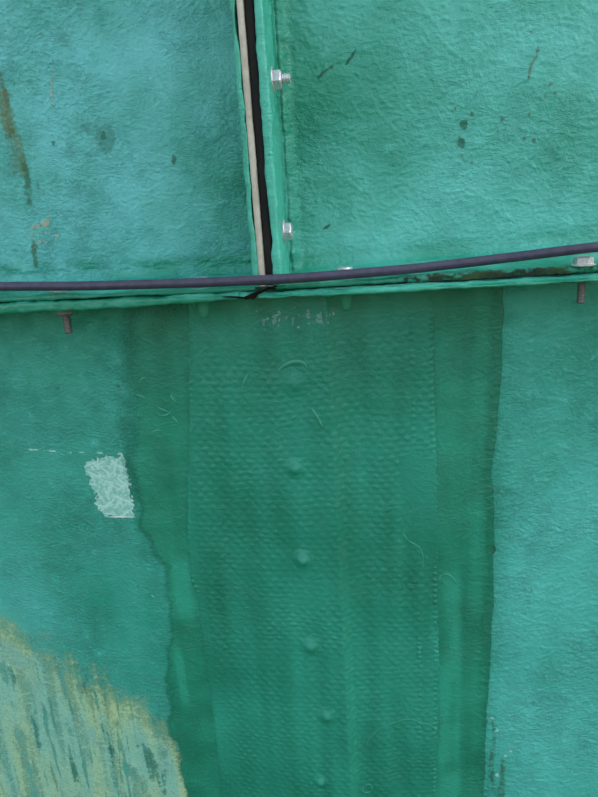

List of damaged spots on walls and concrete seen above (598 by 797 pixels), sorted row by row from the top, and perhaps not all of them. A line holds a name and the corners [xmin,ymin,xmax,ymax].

corrosion [0,88,30,188]
corrosion [30,216,59,267]
peeling [84,453,136,519]